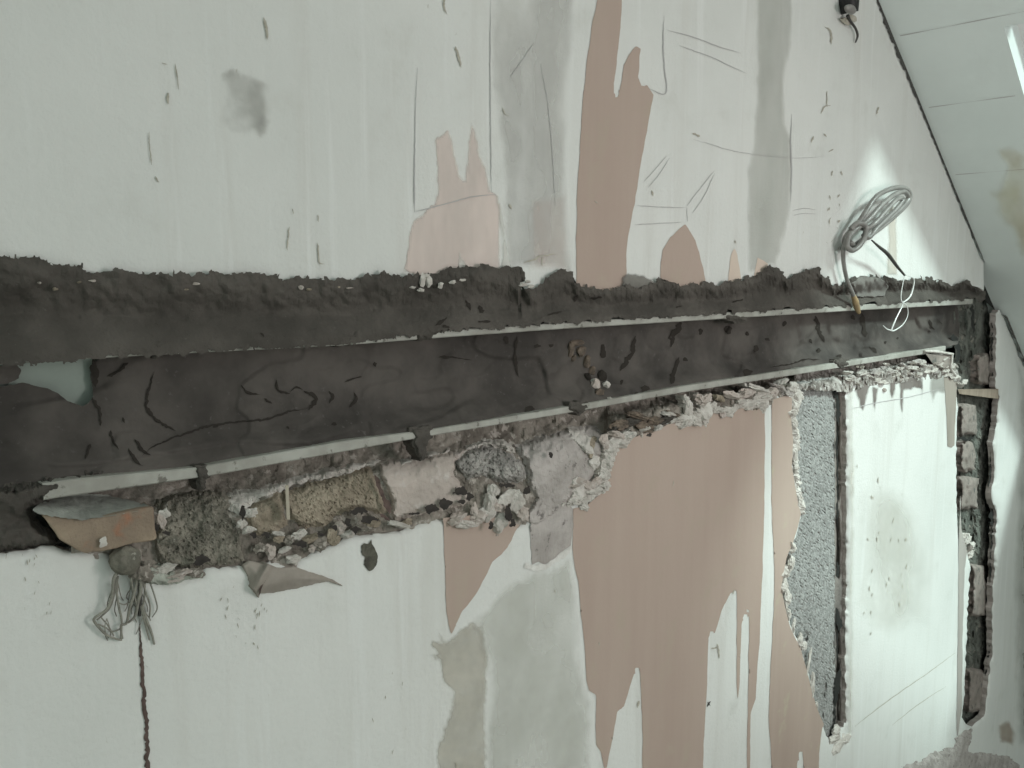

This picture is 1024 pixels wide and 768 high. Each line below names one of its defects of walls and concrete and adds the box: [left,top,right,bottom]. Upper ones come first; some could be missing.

peeling [405,131,500,292]
peeling [573,0,653,302]
peeling [660,225,706,287]
crack [85,359,361,466]
spalling [71,546,115,559]
peeling [87,353,960,768]
spalling [901,497,1020,768]